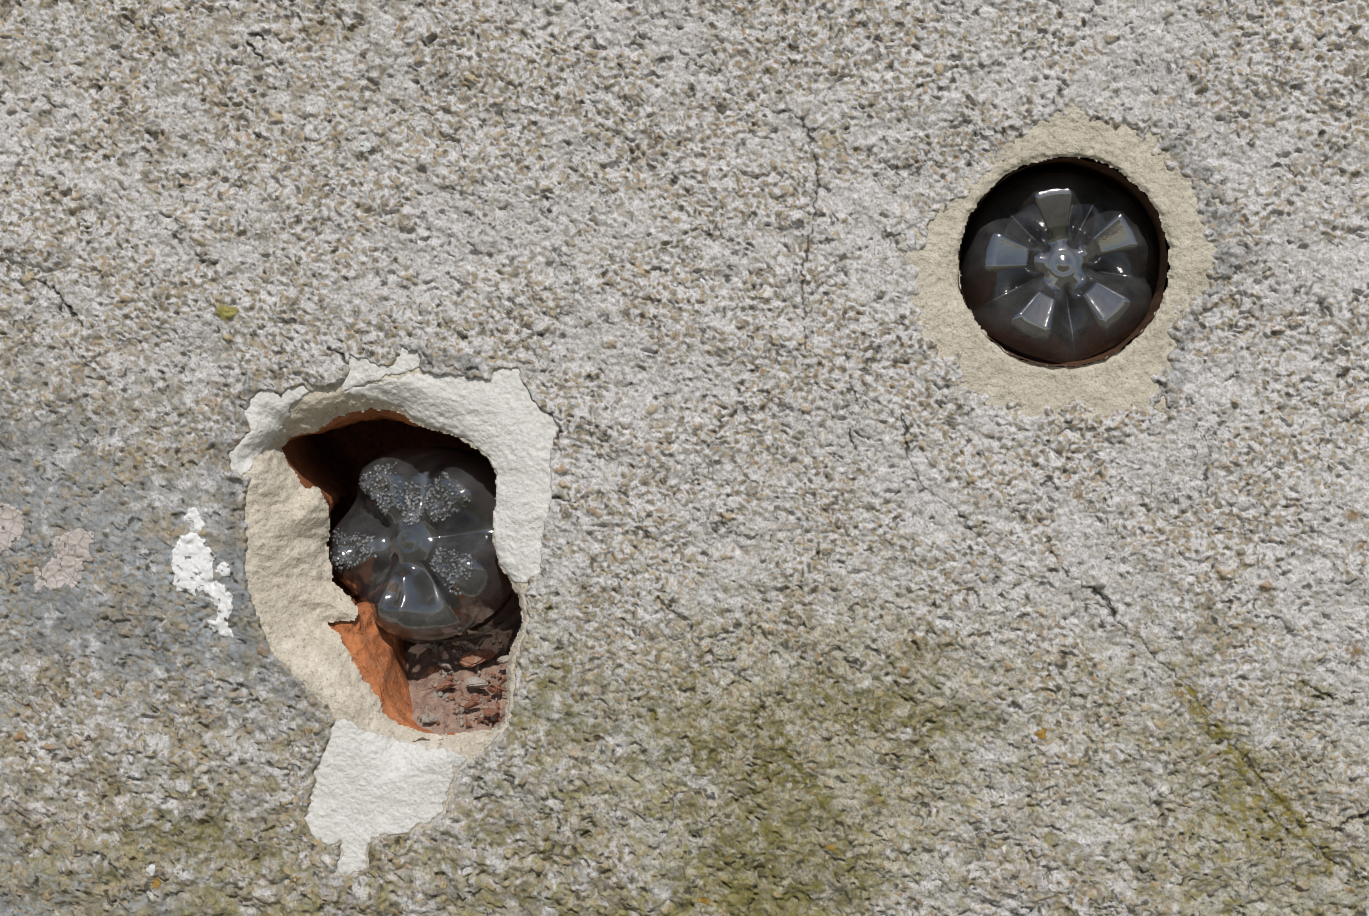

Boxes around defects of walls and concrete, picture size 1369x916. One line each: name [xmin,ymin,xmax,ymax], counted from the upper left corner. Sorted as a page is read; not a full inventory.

flaking render [171,346,559,876]
crack [1047,539,1290,812]
water stain [1171,676,1335,872]
crack [1299,681,1338,699]
crack [1309,811,1369,878]